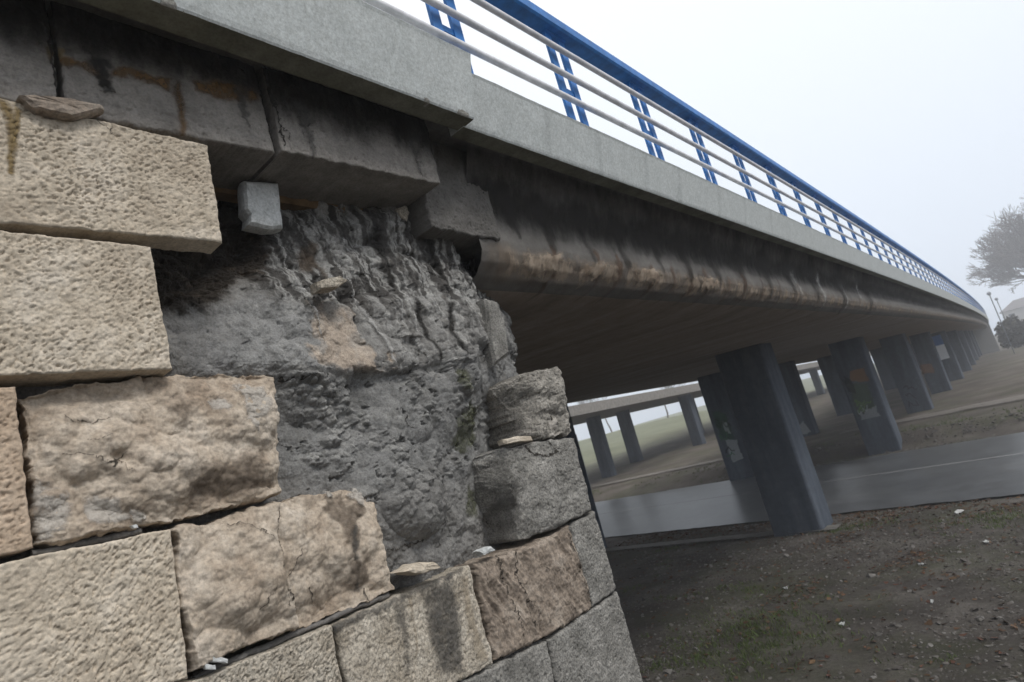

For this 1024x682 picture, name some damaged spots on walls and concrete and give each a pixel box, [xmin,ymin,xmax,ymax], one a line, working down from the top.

corrosion [113,67,186,136]
corrosion [194,80,258,100]
crack [260,90,290,146]
damp [467,173,983,324]
spalling [84,200,519,589]
spalling [30,483,68,542]
crack [227,508,314,610]
damp [324,501,368,589]
crack [495,531,592,636]